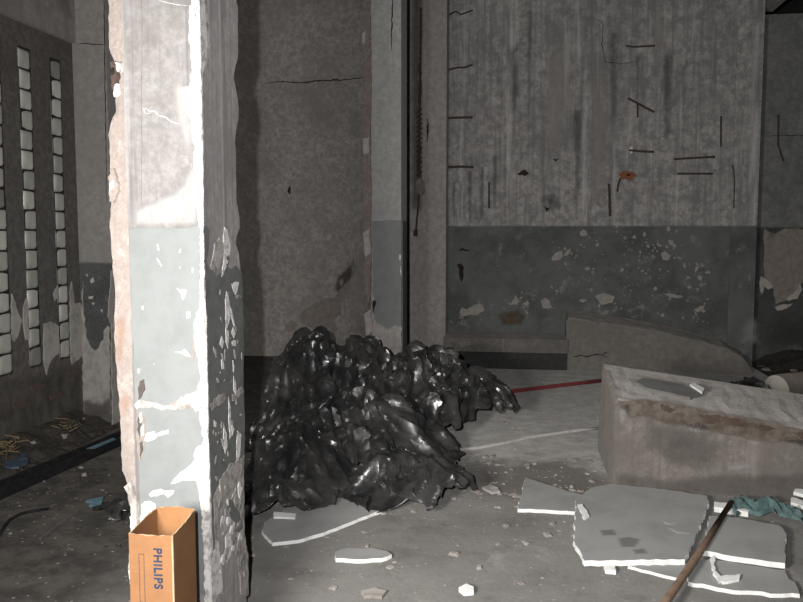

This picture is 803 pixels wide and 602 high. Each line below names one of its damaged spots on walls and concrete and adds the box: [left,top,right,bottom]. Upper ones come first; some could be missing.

crack [388,0,396,50]
crack [264,76,363,84]
corrosion [619,171,635,179]
flaking render [10,294,30,342]
flaking render [43,321,60,375]
peeling [69,270,121,425]
peeling [124,0,249,602]
peeling [551,229,622,309]
peeling [615,223,710,317]
flaking render [759,228,803,311]